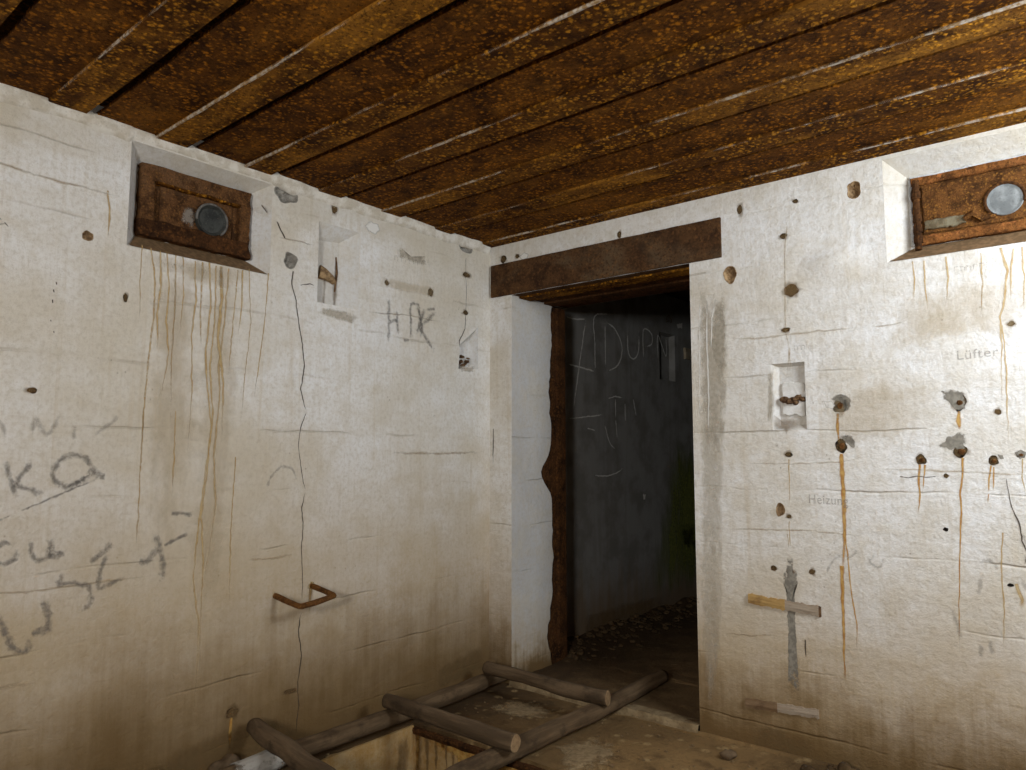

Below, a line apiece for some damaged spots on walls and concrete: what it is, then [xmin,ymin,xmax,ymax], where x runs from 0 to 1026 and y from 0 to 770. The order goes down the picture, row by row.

rust [129,236,269,633]
crack [291,271,313,590]
rust [891,230,1026,423]
crack [295,619,303,728]
rust [839,454,858,672]
rust [1001,533,1023,618]